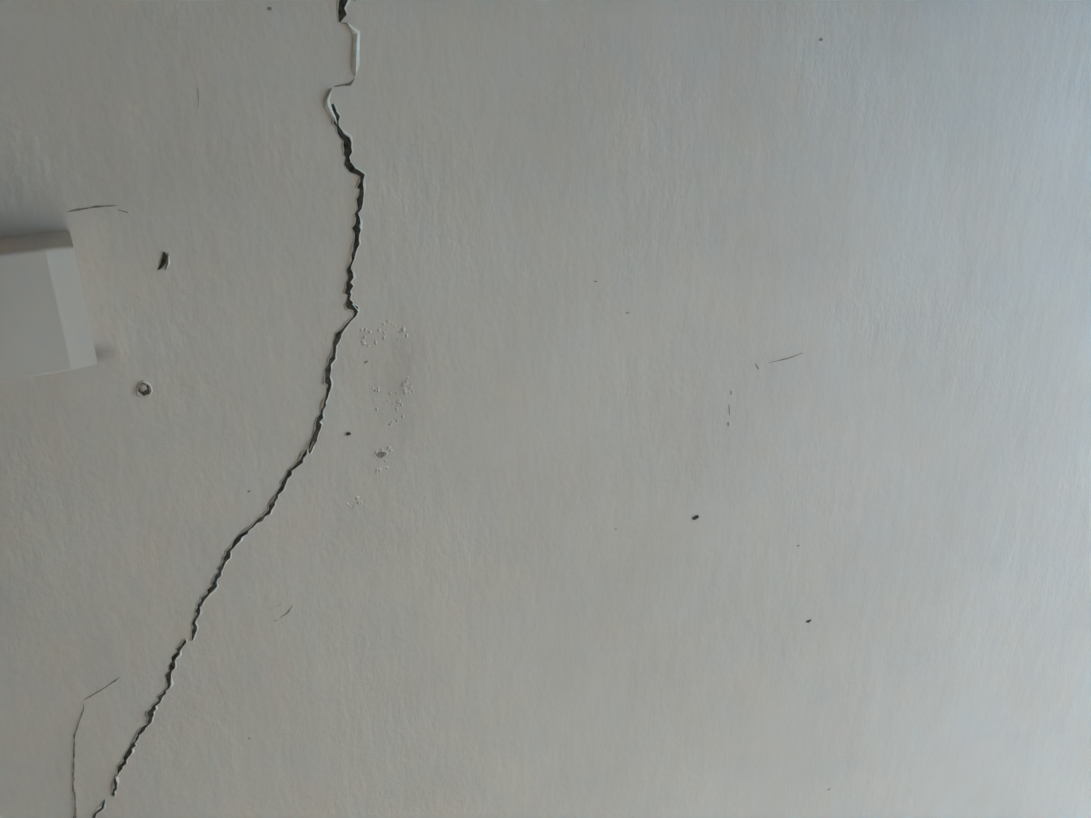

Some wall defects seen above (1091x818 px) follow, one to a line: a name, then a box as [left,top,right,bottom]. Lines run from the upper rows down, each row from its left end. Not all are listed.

crack [68,0,366,818]